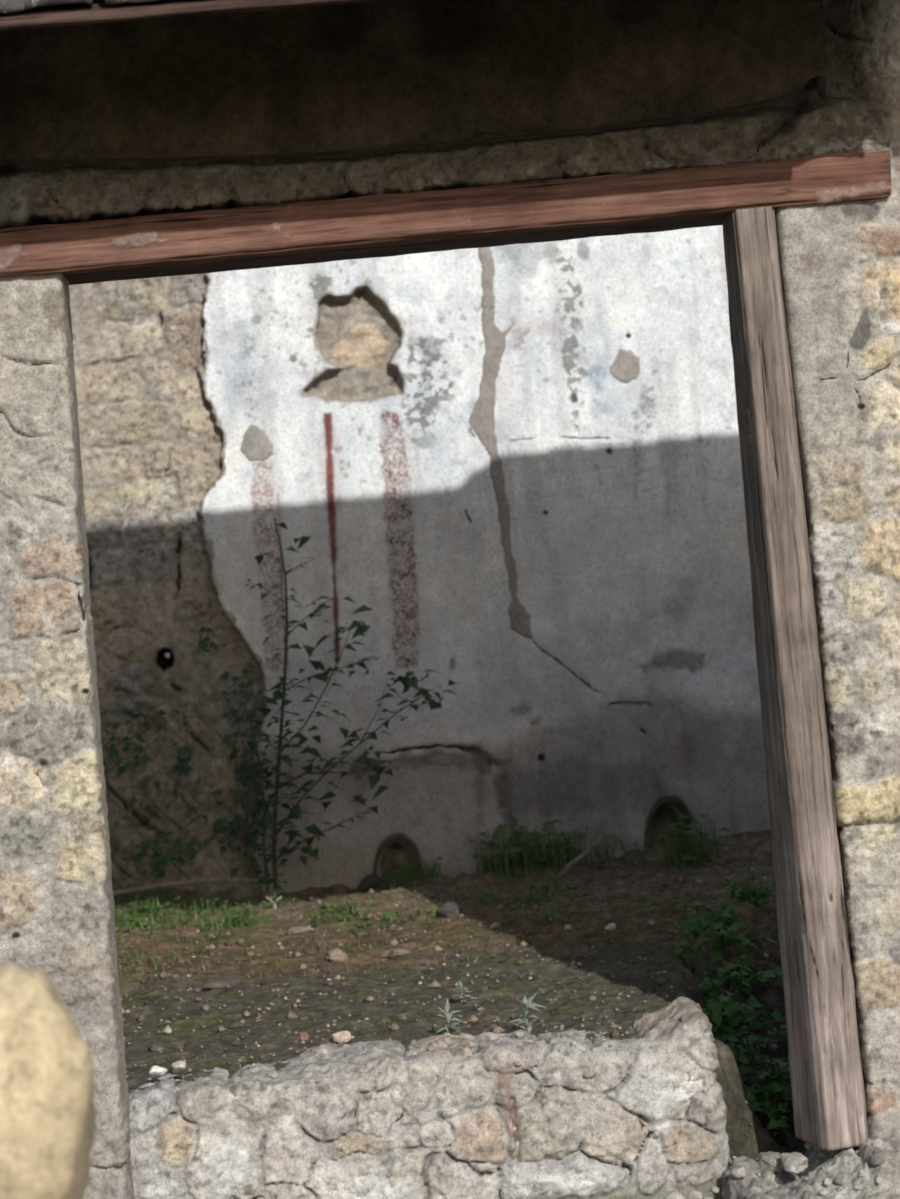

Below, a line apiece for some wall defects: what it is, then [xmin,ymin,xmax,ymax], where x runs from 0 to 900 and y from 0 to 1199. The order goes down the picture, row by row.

flaking render [198,279,261,661]
spalling [241,377,273,461]
spalling [306,275,453,427]
crack [464,247,652,734]
crack [382,744,491,764]